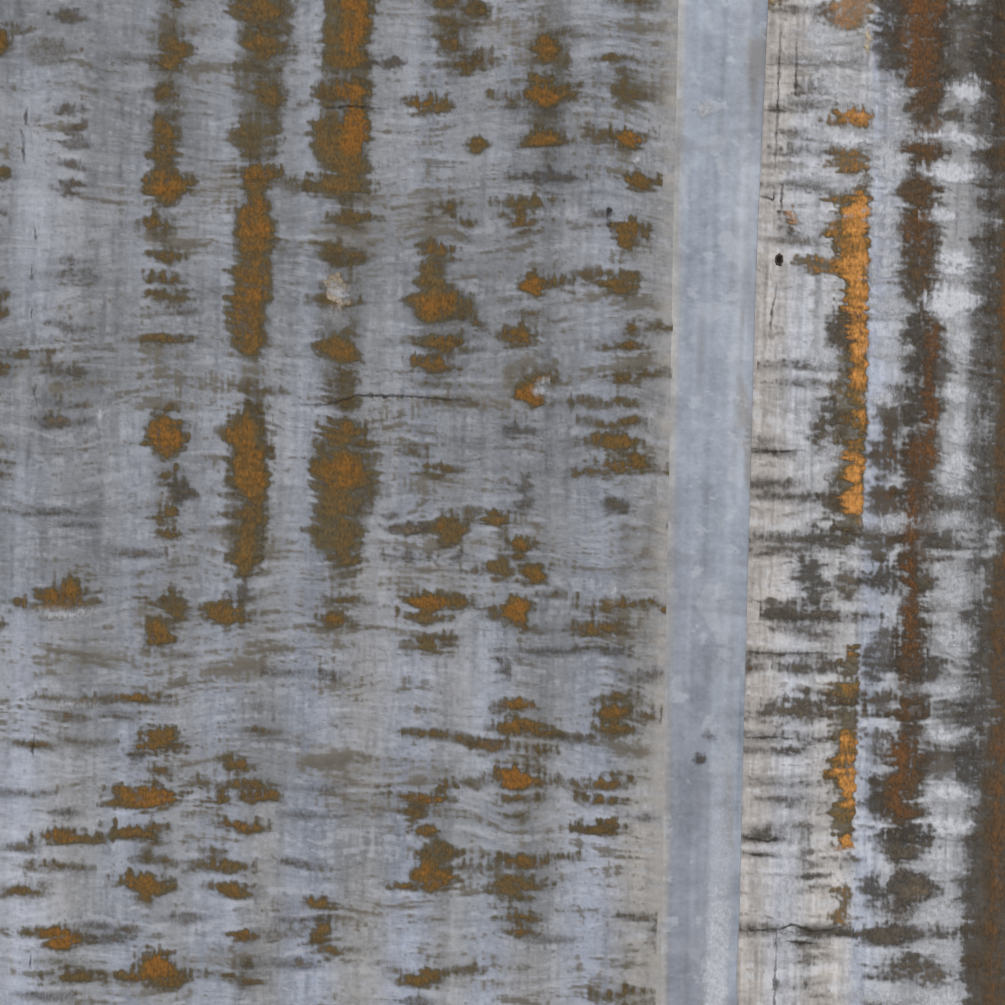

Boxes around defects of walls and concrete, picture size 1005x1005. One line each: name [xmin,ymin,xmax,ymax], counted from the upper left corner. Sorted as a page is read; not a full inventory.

corrosion [138,114,199,234]
corrosion [223,0,382,360]
corrosion [402,237,482,384]
corrosion [214,380,285,580]
corrosion [301,282,384,579]
corrosion [396,506,666,654]
corrosion [567,394,669,478]
corrosion [790,0,968,851]
corrosion [960,0,1005,1005]
corrosion [13,724,281,907]
corrosion [381,696,633,938]
corrosion [18,924,192,991]